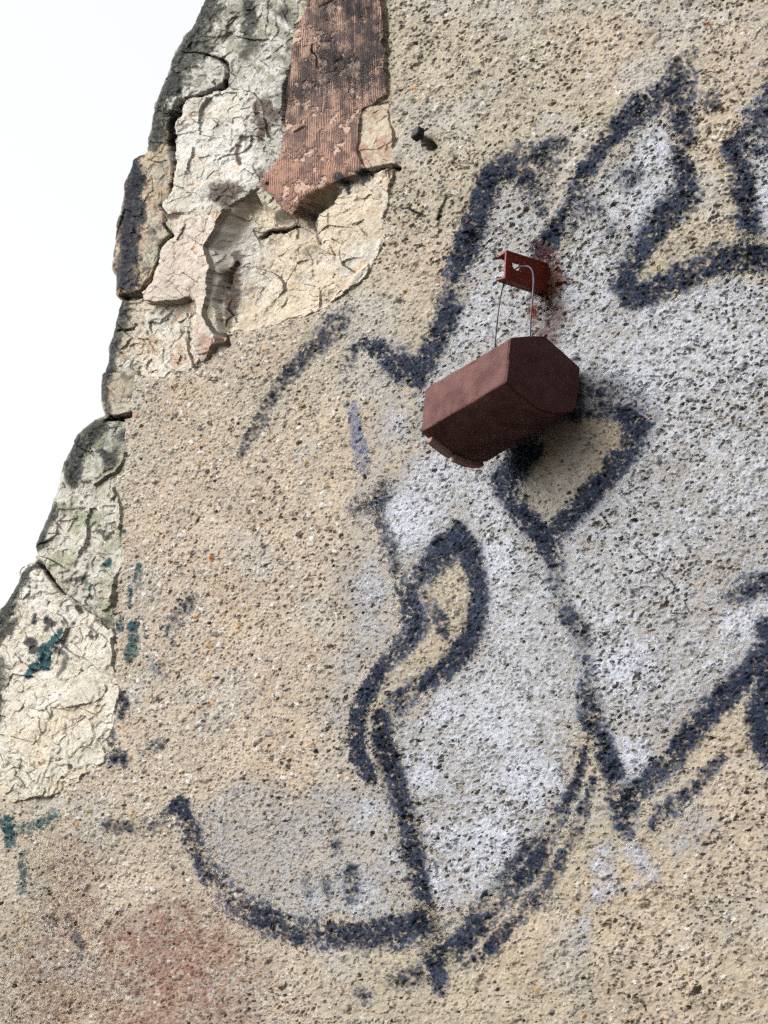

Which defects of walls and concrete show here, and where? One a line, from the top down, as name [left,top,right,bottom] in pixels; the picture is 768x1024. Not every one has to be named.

spalling [295,0,307,24]
crack [310,43,342,67]
crack [154,51,230,274]
spalling [109,86,401,378]
crack [262,226,299,239]
corrosion [528,265,566,325]
spalling [0,564,122,803]